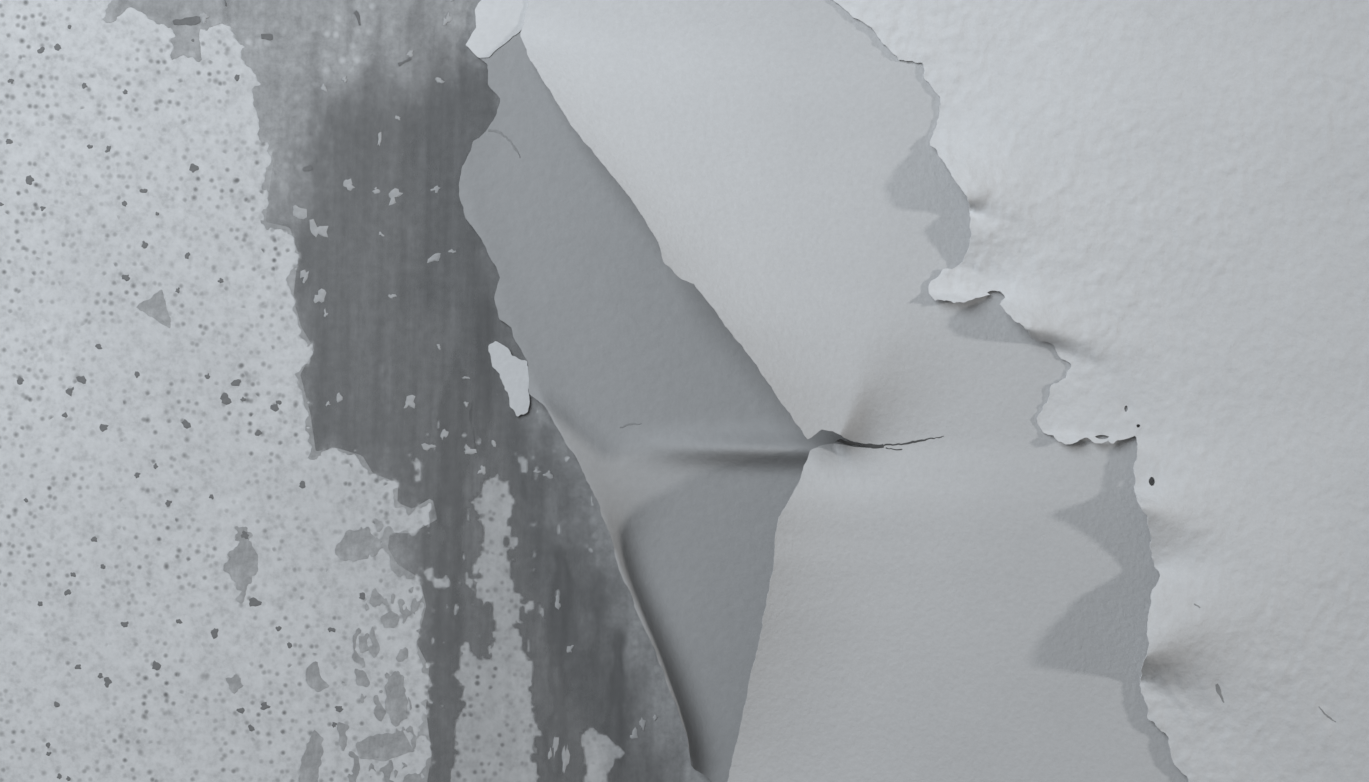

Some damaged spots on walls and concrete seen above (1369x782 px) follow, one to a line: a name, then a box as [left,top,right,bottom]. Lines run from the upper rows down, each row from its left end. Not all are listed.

leakage [304,84,621,782]
peeling [103,0,850,782]
crack [836,436,943,450]
peeling [520,0,1369,782]